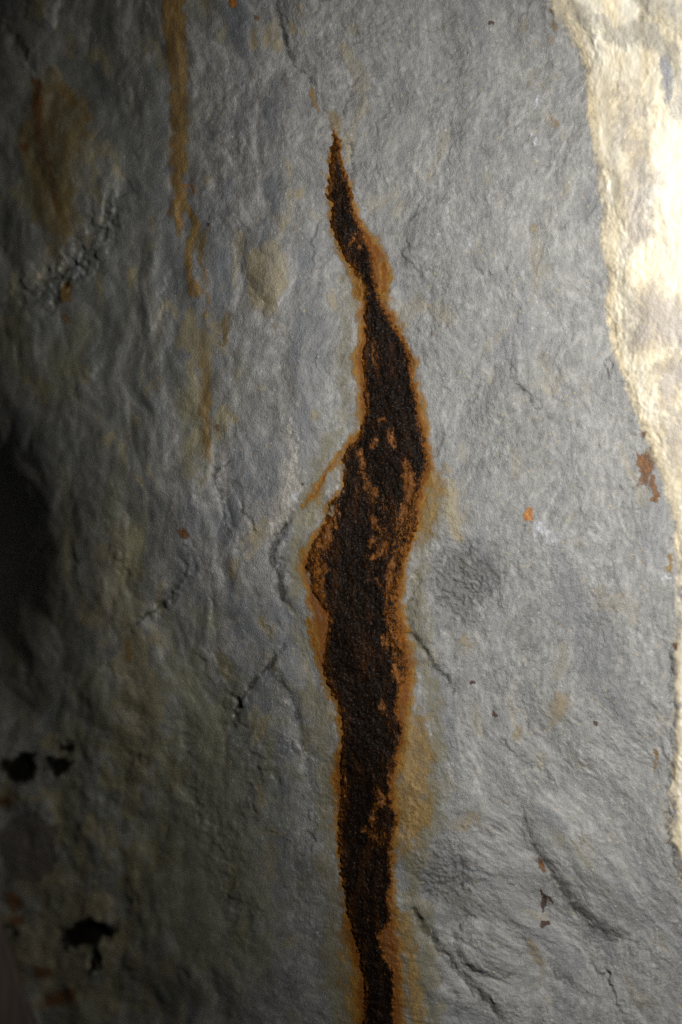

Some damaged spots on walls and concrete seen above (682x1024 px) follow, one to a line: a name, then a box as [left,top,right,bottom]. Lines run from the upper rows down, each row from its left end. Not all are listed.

corrosion [161,0,211,315]
corrosion [636,448,660,502]
corrosion [296,87,451,1024]
damp [0,740,75,784]
damp [59,916,118,974]